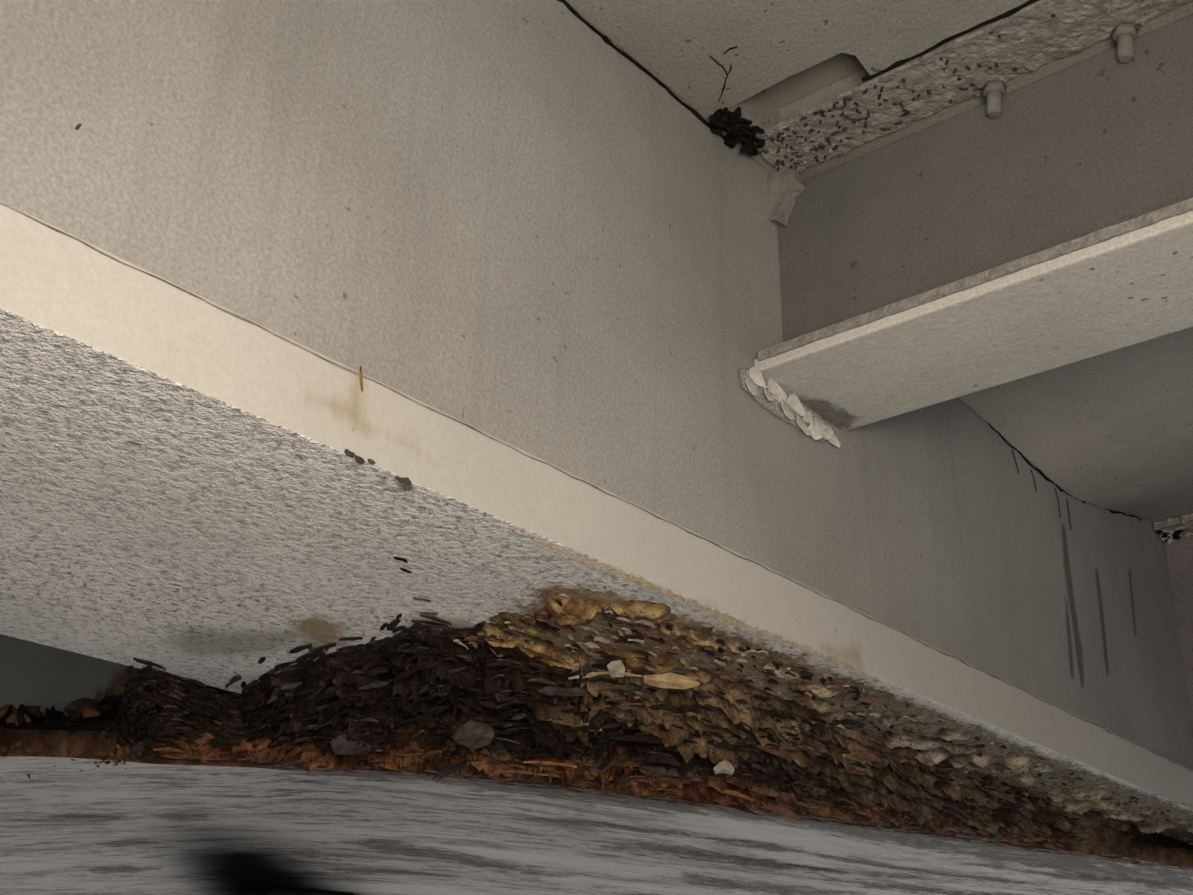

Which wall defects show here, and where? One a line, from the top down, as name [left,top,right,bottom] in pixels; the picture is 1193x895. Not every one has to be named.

crack [557,0,738,141]
spalling [709,57,998,173]
peeling [739,366,841,448]
crack [986,421,1143,530]
spalling [1156,527,1193,544]
rust [66,571,1193,870]